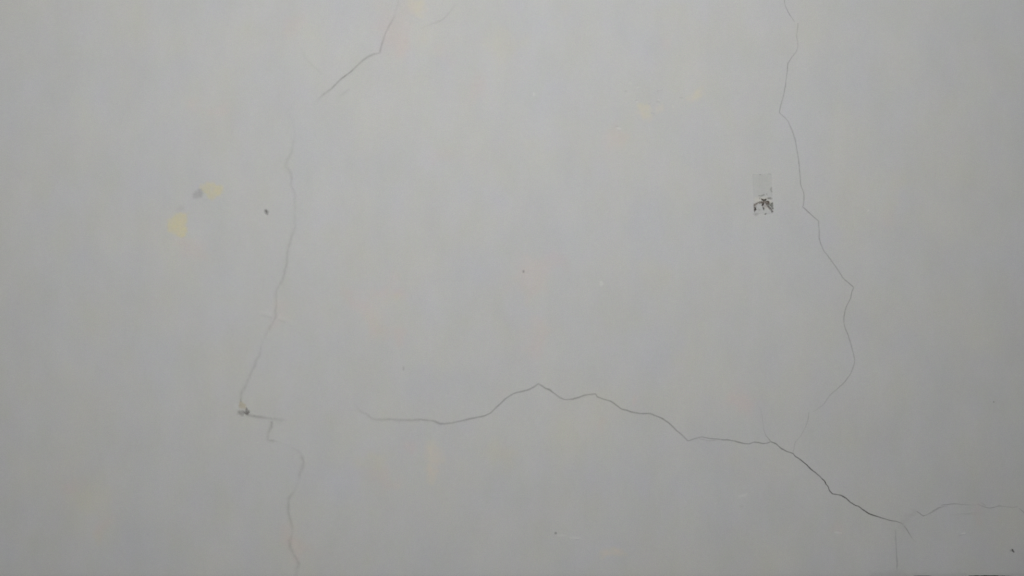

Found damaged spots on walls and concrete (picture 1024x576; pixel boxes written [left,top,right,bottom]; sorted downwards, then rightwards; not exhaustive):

crack [352,0,917,572]